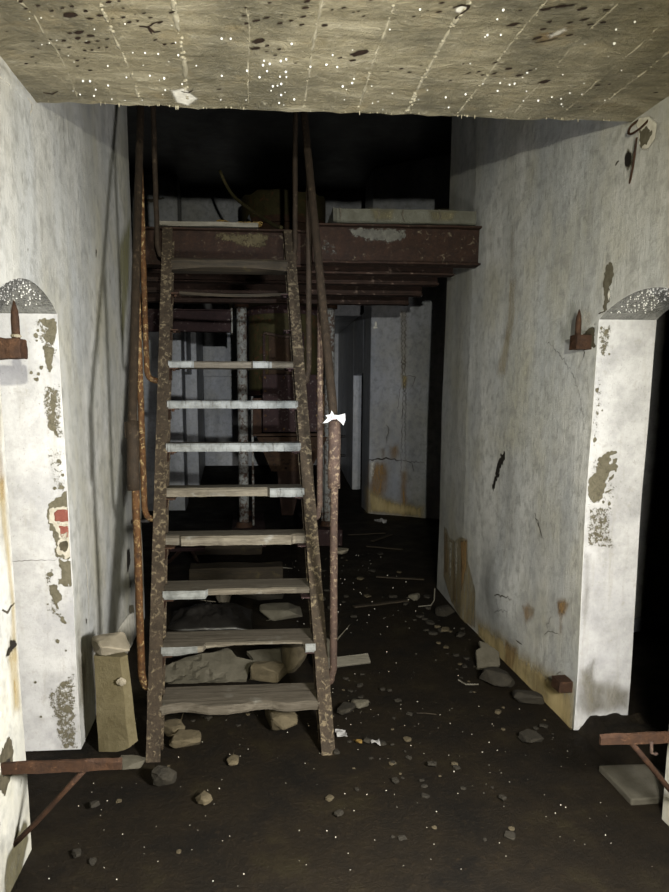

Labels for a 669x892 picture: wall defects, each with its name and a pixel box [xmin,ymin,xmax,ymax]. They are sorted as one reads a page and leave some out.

leakage [99,3,140,97]
leakage [157,0,207,109]
leakage [225,6,251,110]
leakage [391,0,472,114]
leakage [457,0,548,119]
spalling [615,117,657,169]
peeling [30,318,63,437]
crack [369,311,422,471]
spalling [46,450,72,624]
peeling [588,451,618,548]
peeling [40,674,78,748]
flaking render [0,737,14,796]